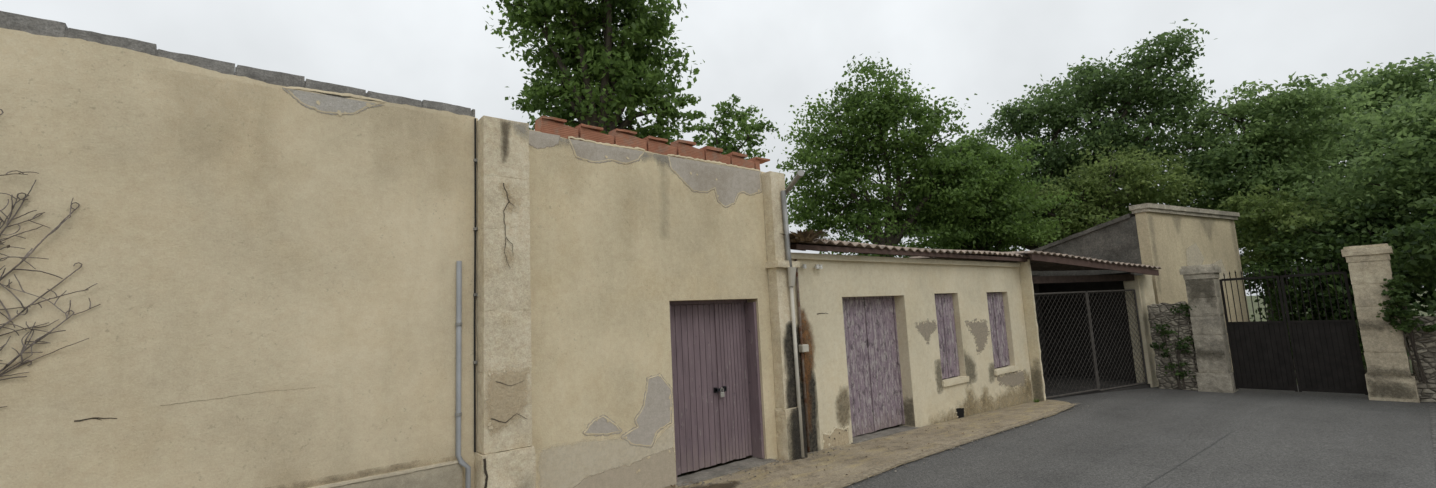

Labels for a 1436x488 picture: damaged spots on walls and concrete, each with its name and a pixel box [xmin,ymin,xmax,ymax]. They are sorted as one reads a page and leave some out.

spalling [283,86,385,117]
spalling [529,130,645,165]
spalling [667,154,762,208]
peeling [574,374,676,488]
damp [784,322,819,460]
damp [837,390,850,426]